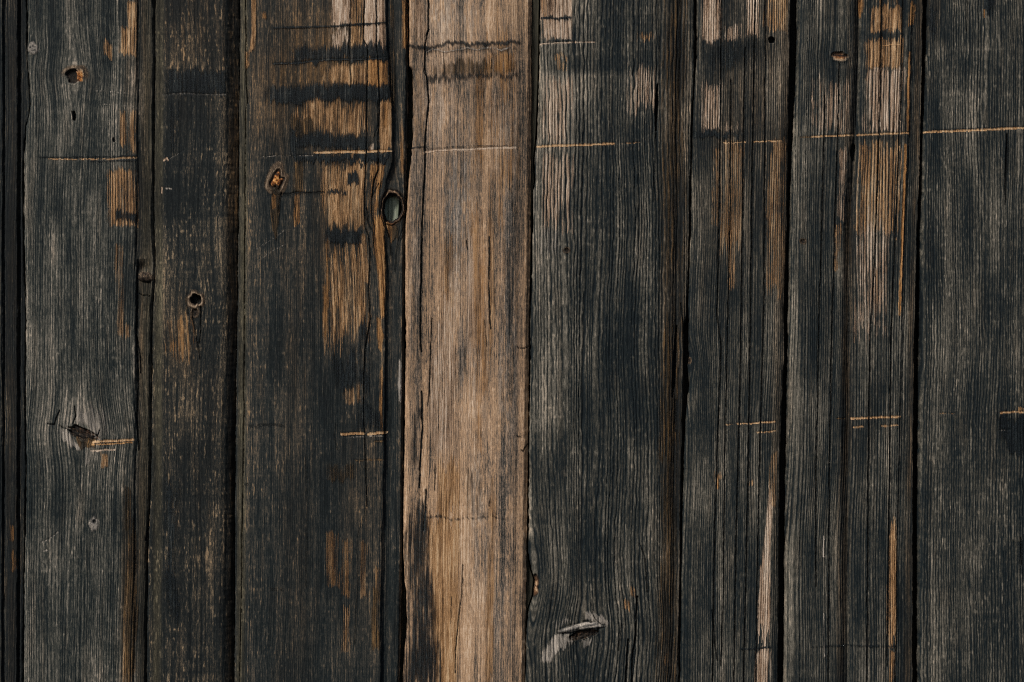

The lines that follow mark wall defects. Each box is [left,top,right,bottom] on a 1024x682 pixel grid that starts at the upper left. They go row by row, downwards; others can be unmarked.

crack [349,0,448,645]
crack [466,236,491,347]
crack [672,303,684,432]